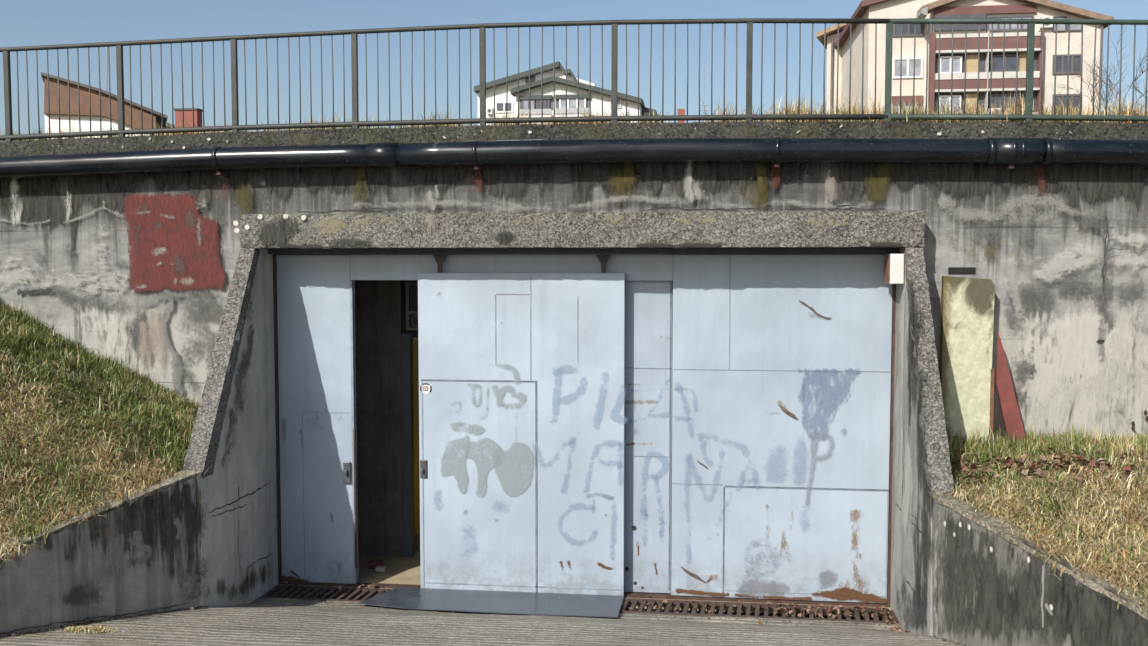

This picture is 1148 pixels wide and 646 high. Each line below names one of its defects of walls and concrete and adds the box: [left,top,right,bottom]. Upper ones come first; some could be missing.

damp [17,253,125,344]
damp [125,309,147,360]
peeling [152,247,186,274]
damp [181,290,222,391]
damp [0,164,554,267]
damp [570,162,1148,361]
damp [897,284,1148,646]
damp [16,480,206,599]
crack [209,480,275,570]
damp [218,568,266,596]